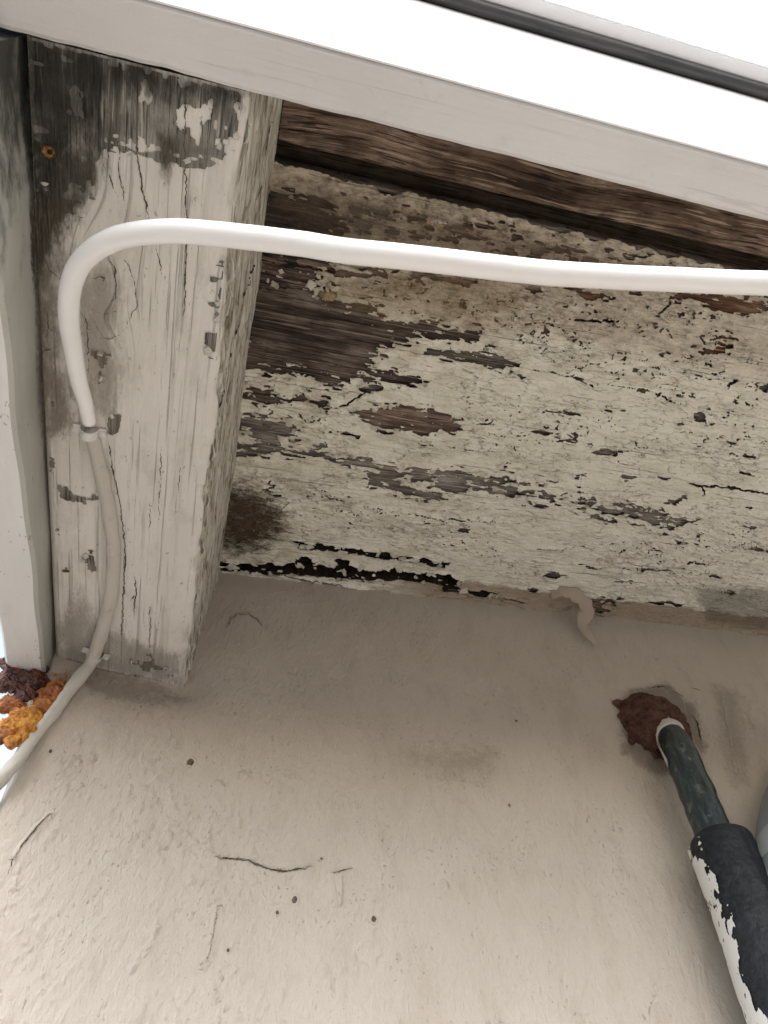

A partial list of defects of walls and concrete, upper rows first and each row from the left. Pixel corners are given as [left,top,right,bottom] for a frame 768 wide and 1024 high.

peeling [28,40,252,264]
water stain [22,35,241,439]
peeling [264,187,693,266]
peeling [203,255,235,359]
peeling [663,292,768,358]
peeling [106,413,121,436]
peeling [236,252,708,547]
peeling [57,485,99,505]
water stain [224,484,289,556]
spalling [220,540,517,602]
crack [8,811,55,874]
crack [215,853,354,873]